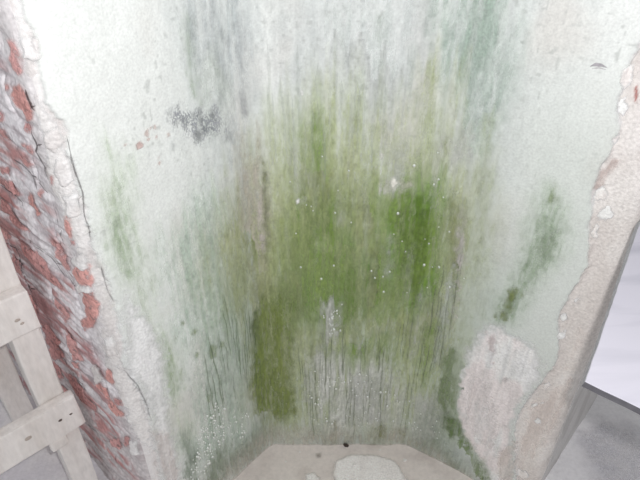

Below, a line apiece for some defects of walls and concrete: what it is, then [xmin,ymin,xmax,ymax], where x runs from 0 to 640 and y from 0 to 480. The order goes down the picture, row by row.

spalling [8,5,41,77]
leakage [187,0,244,99]
leakage [426,0,507,141]
spalling [0,167,20,196]
spalling [0,198,30,232]
spalling [5,85,180,480]
leakage [168,95,469,480]
spalling [457,50,640,480]